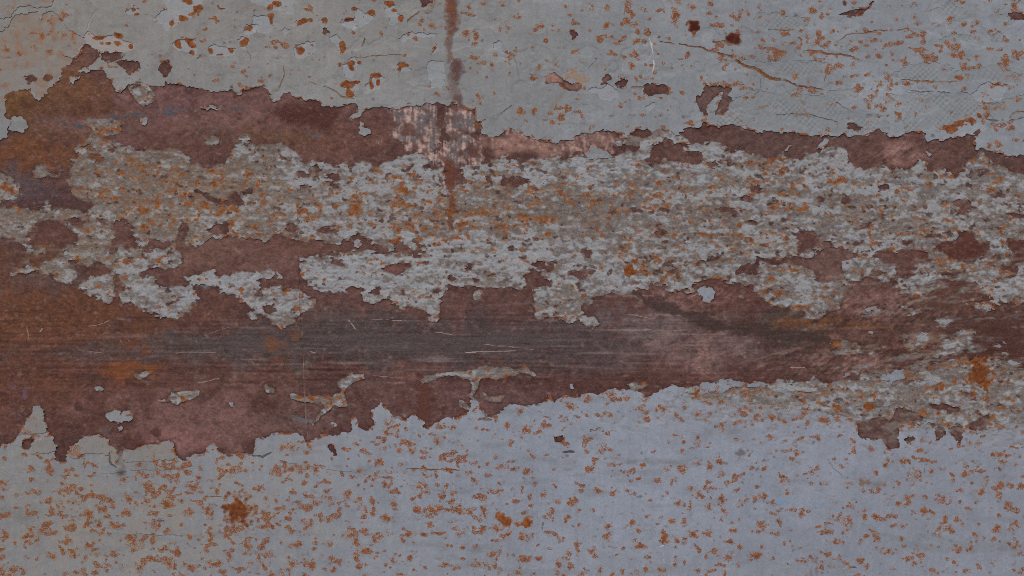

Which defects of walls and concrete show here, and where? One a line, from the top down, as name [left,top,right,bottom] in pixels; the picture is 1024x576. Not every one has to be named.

rust [443,0,481,105]
rust [670,0,700,34]
rust [725,14,742,45]
rust [939,113,982,134]
peeling [0,31,1024,462]
rust [620,254,651,278]
rust [961,355,1001,410]
rust [24,469,613,576]
rust [584,439,622,497]
rust [634,464,713,550]
rust [704,492,769,563]
rust [899,467,949,531]